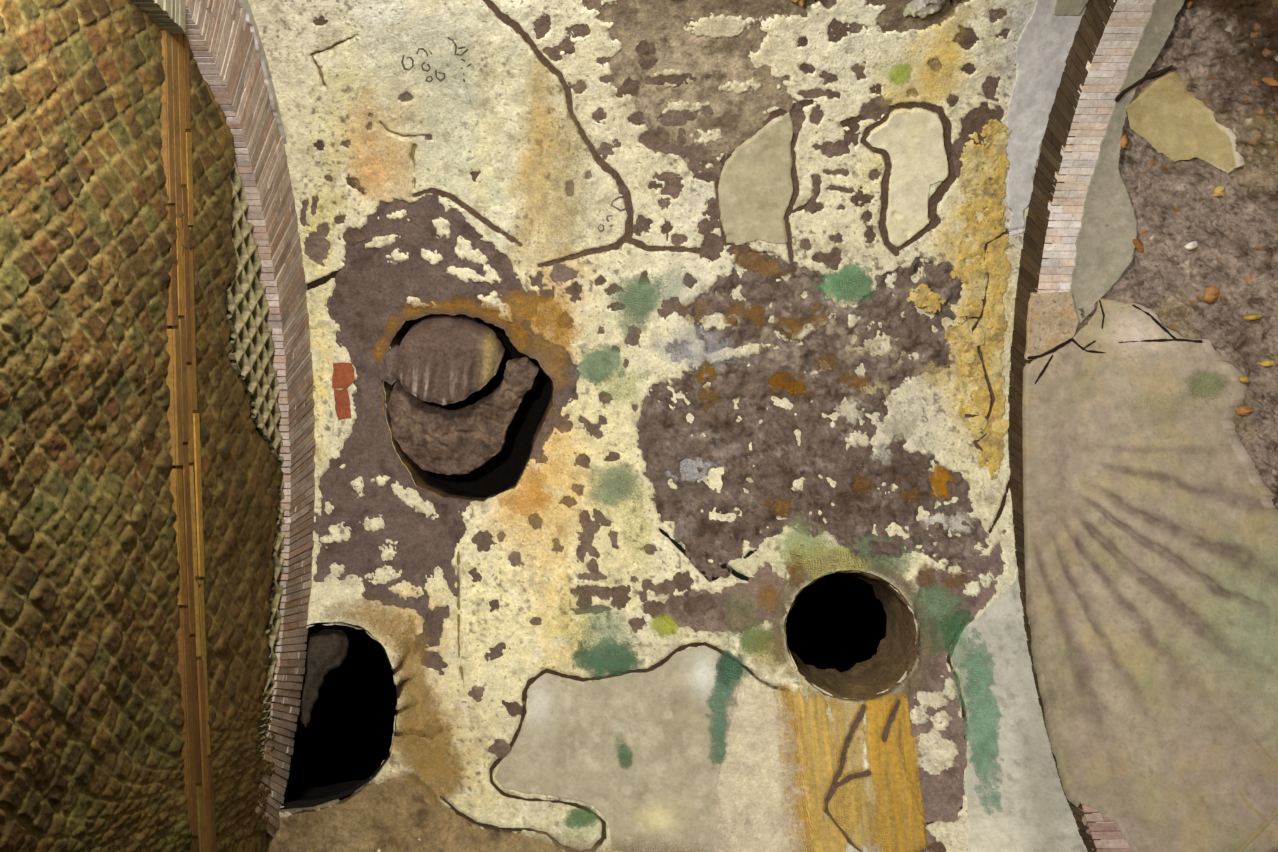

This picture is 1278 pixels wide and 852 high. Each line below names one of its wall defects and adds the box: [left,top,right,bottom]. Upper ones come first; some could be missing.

crack [379,0,821,278]
crack [841,102,957,256]
flaking render [300,194,625,675]
rust [374,291,572,377]
flaking render [533,0,1013,852]
crack [965,230,1011,452]
crack [1027,299,1203,384]
flaking render [266,775,563,852]
flaking render [502,700,526,717]
crack [440,642,790,852]
rust [777,686,926,852]
leakage [707,525,1003,852]